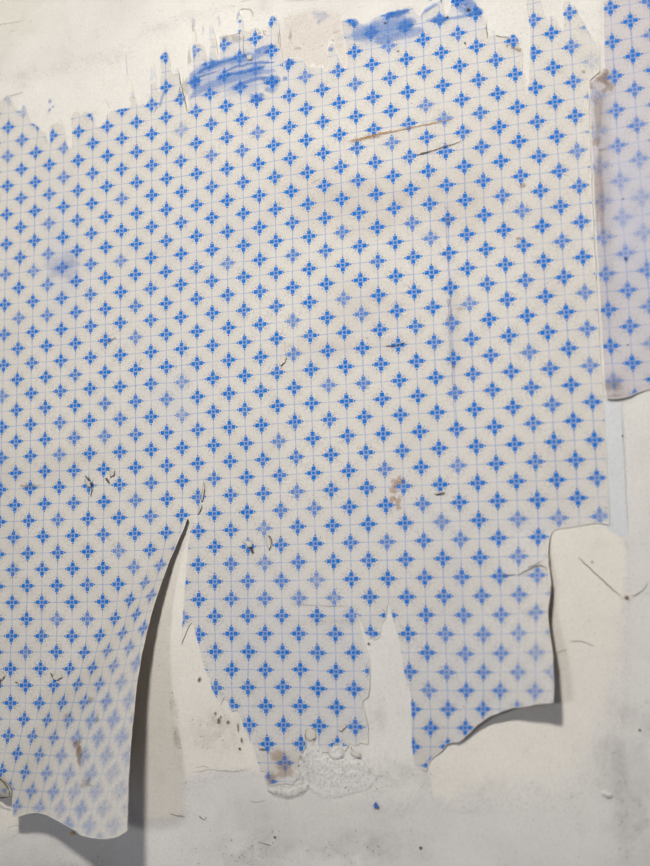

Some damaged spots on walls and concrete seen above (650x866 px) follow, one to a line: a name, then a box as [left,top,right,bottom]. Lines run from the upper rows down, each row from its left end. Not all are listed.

peeling [0,3,281,148]
peeling [480,0,529,93]
peeling [542,0,603,45]
peeling [0,480,632,845]